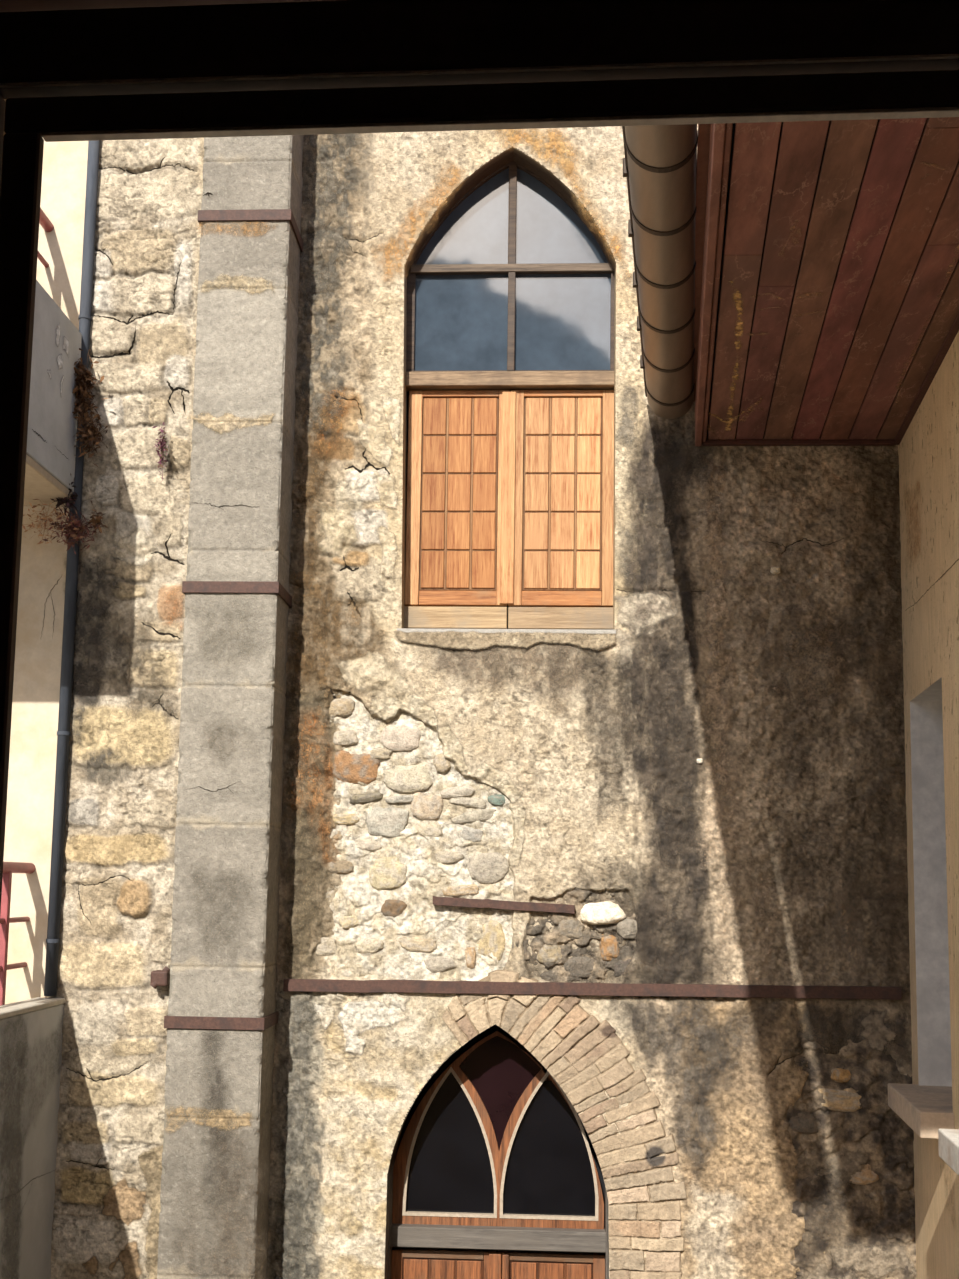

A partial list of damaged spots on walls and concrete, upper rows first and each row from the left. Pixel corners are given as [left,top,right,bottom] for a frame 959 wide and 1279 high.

water stain [1,1016,59,1279]
spalling [315,691,638,1055]
water stain [437,388,865,1176]
spalling [782,1011,917,1279]
water stain [813,453,919,996]
water stain [883,1014,912,1067]